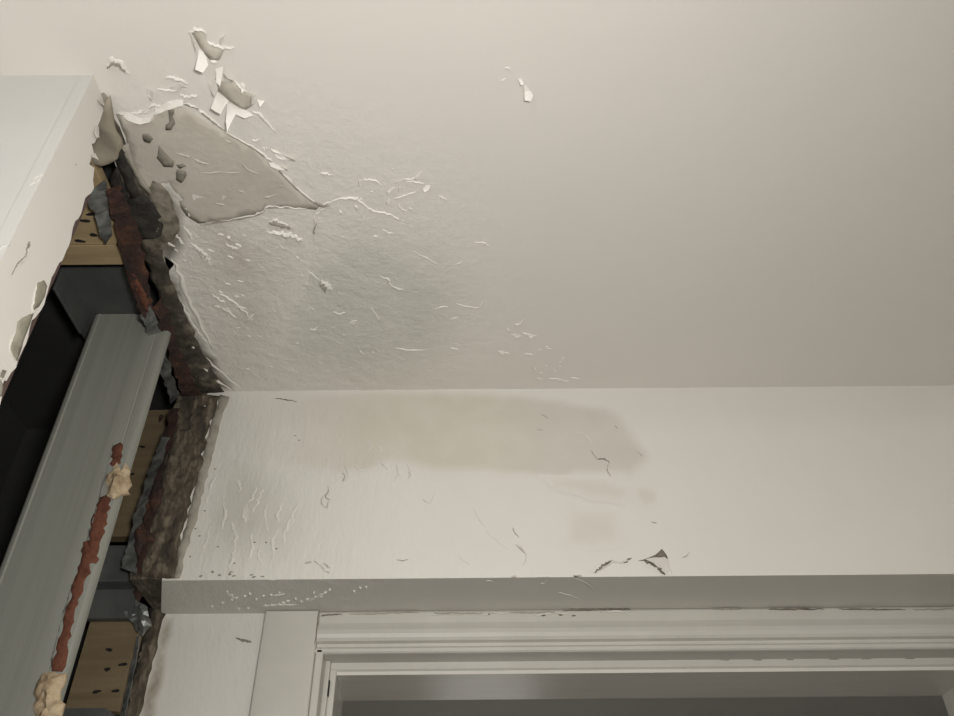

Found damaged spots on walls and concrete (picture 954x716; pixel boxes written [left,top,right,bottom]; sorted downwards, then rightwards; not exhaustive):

peeling [500,67,533,102]
crack [312,197,399,244]
flaking render [9,280,47,361]
peeling [114,27,331,716]
water stain [110,166,659,580]
rust [110,442,123,466]
rust [51,494,111,672]
crack [594,558,631,573]